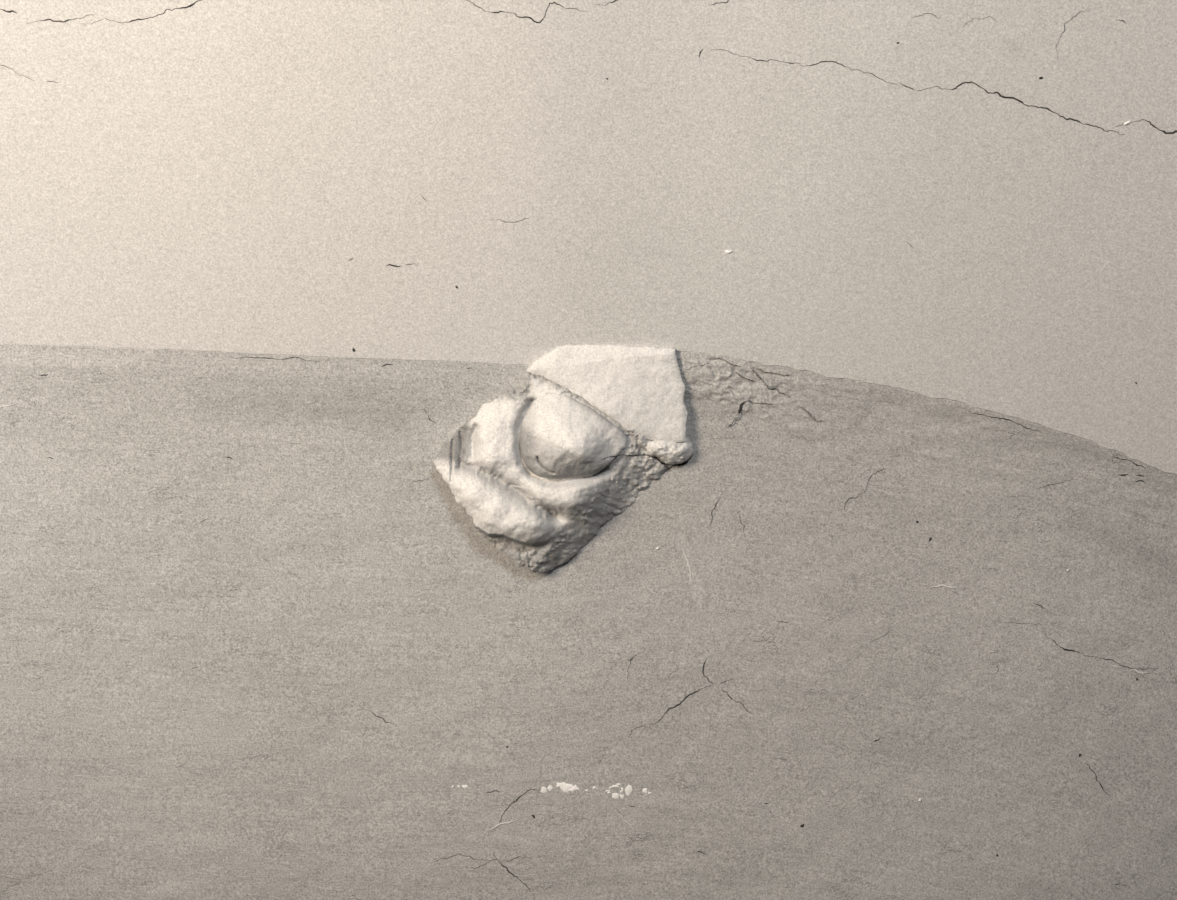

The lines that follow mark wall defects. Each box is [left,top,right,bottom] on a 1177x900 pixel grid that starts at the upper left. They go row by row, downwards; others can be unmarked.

crack [0,0,201,24]
crack [467,0,617,23]
crack [699,49,1177,135]
crack [730,400,768,425]
crack [630,658,750,734]